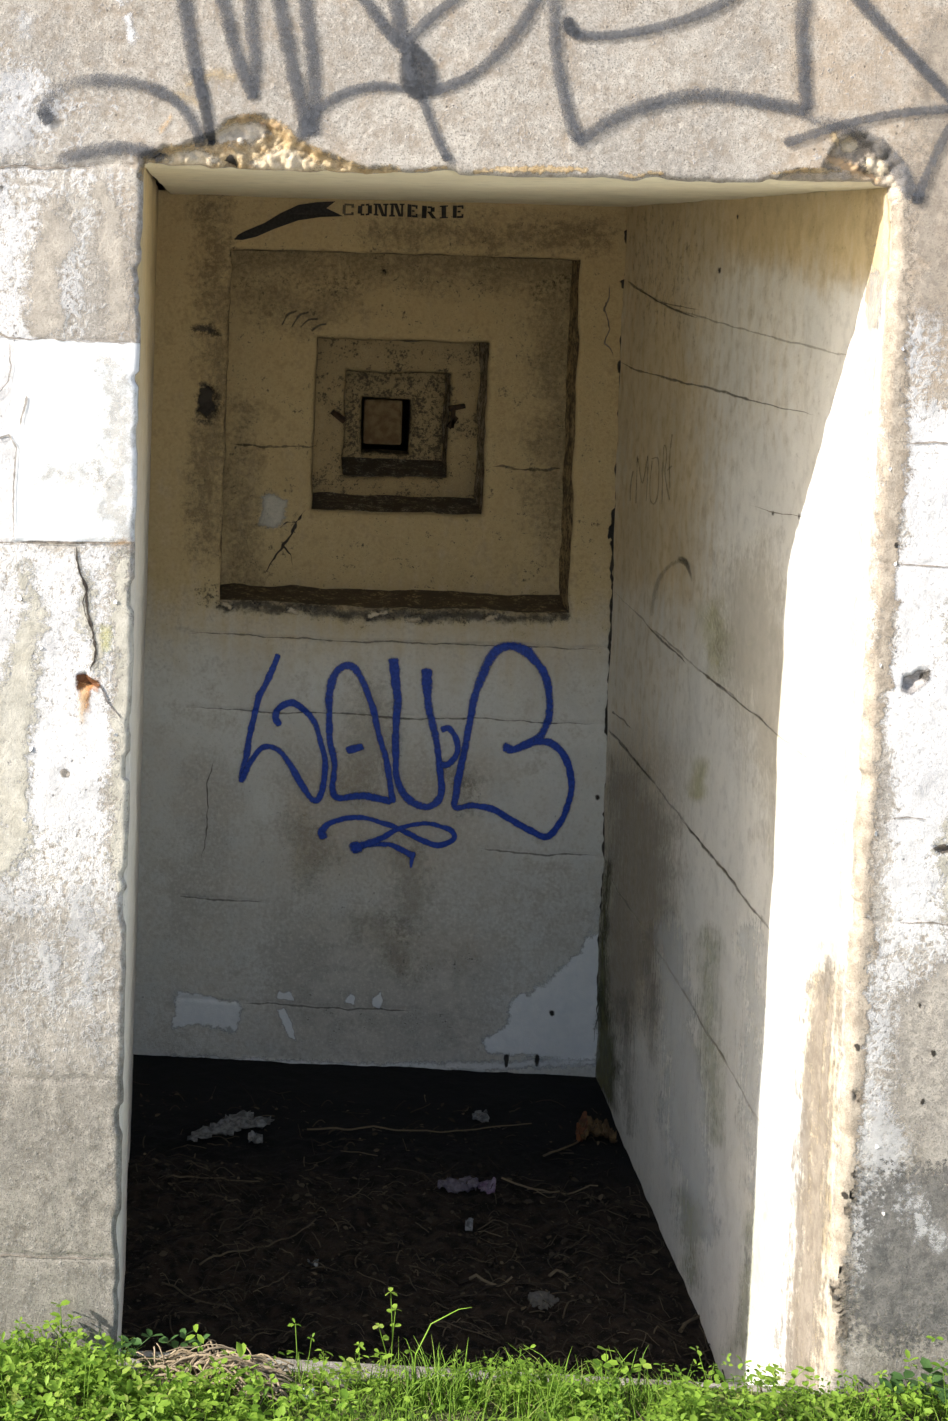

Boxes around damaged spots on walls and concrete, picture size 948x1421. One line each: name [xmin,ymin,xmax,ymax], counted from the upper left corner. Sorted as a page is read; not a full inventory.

spalling [137,113,448,181]
spalling [473,165,589,175]
crack [0,332,133,718]
crack [191,230,808,783]
rust [76,674,100,715]
peeling [769,13,948,1378]
peeling [172,991,242,1033]
peeling [482,931,599,1069]
crack [481,783,606,1039]
leakage [775,956,948,1389]